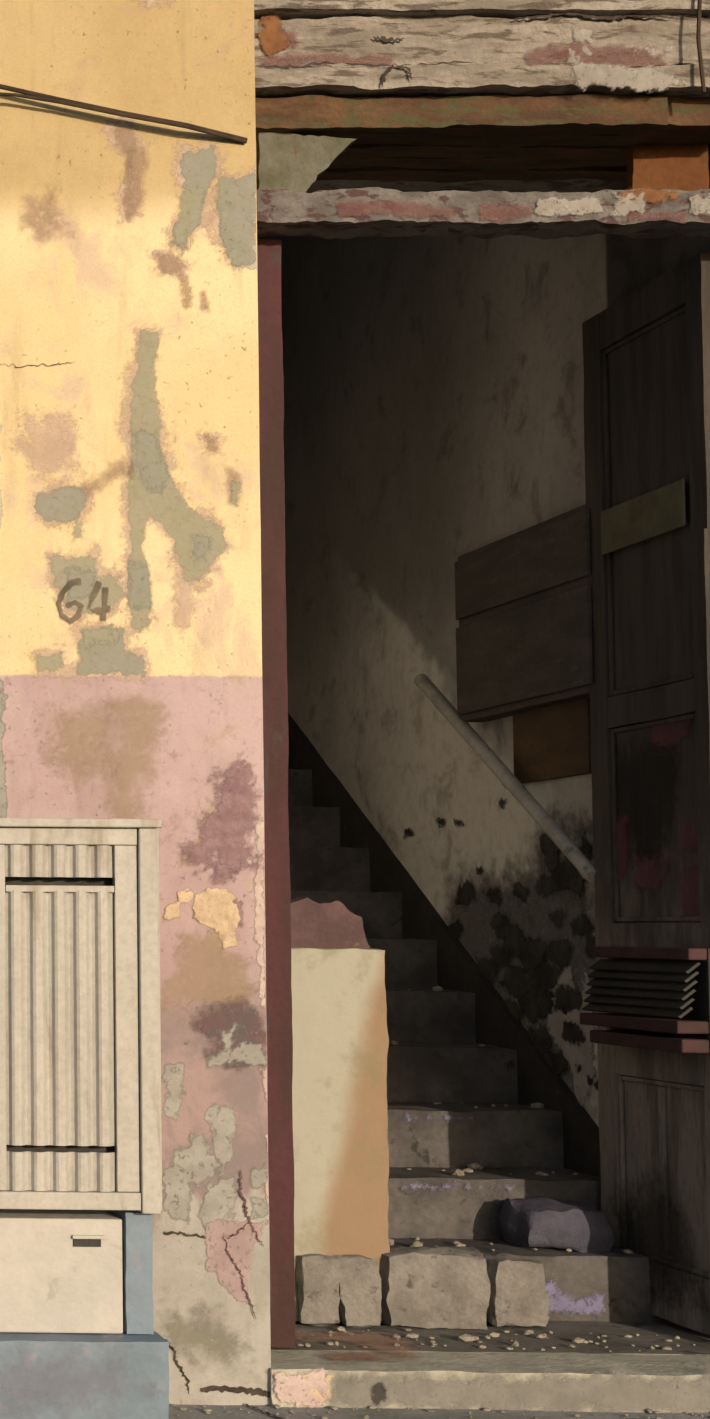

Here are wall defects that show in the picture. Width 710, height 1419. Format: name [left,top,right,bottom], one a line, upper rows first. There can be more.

peeling [102,118,145,218]
flaking render [152,139,257,280]
peeling [534,188,710,216]
peeling [30,328,233,683]
peeling [230,473,241,504]
peeling [163,759,266,1009]
peeling [162,1063,186,1120]
flaking render [259,1068,267,1101]
crack [163,1170,264,1319]
peeling [162,1104,269,1303]
crack [165,1339,283,1419]